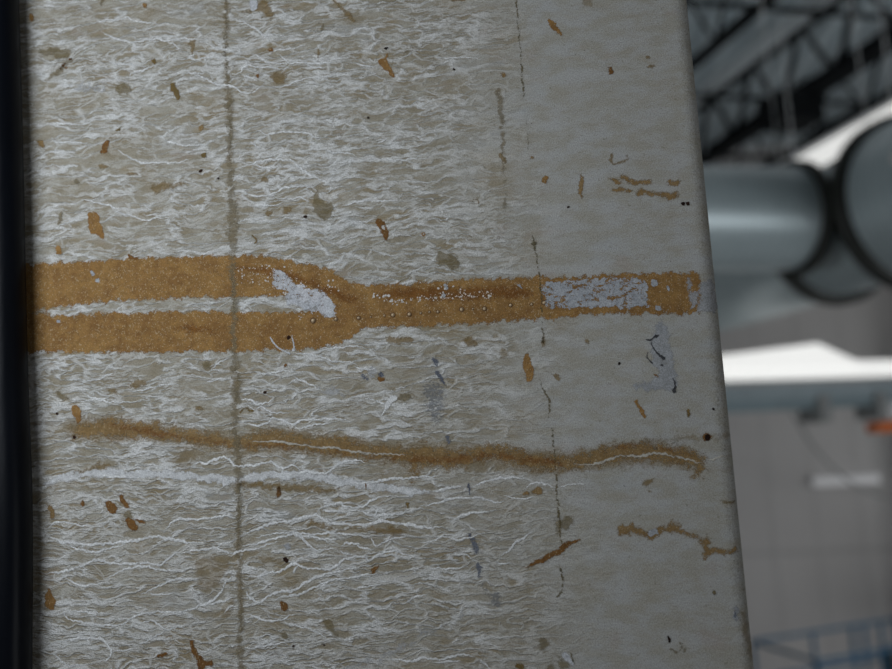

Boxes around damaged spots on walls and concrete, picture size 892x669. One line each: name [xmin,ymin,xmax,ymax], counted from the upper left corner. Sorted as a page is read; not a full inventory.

crack [515,1,525,96]
corrosion [609,154,680,201]
peeling [323,299,334,318]
corrosion [26,235,702,355]
crack [531,235,544,343]
corrosion [71,405,708,483]
corrosion [525,539,580,569]
corrosion [618,521,737,561]